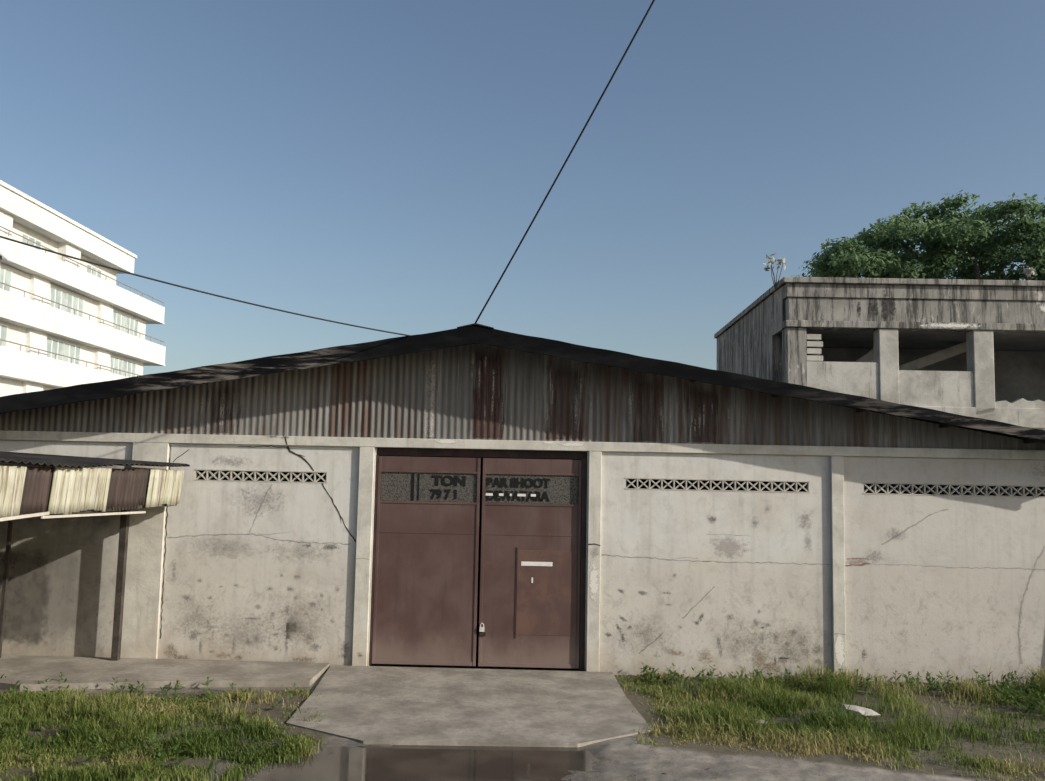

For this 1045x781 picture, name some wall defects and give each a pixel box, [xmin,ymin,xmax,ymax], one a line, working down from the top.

damp [857,299,896,319]
corrosion [469,354,505,438]
corrosion [545,369,592,440]
corrosion [660,392,730,442]
crack [239,438,356,542]